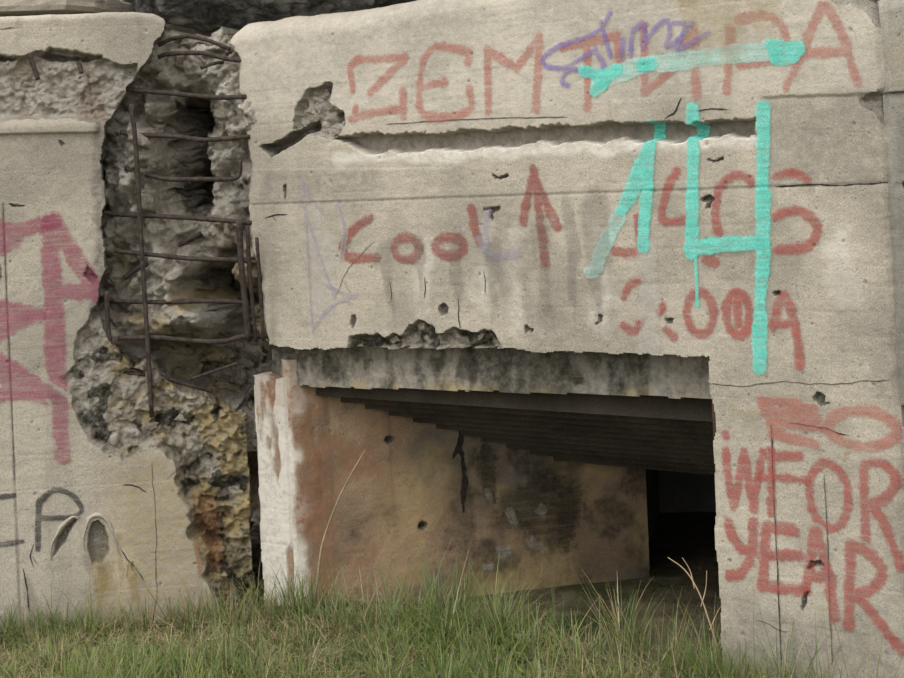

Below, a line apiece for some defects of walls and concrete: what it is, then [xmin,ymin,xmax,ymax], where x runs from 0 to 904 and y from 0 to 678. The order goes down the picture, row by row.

spalling [157,30,242,82]
spalling [0,50,346,616]
spalling [346,314,502,349]
peeling [438,303,449,316]
crack [452,431,468,513]